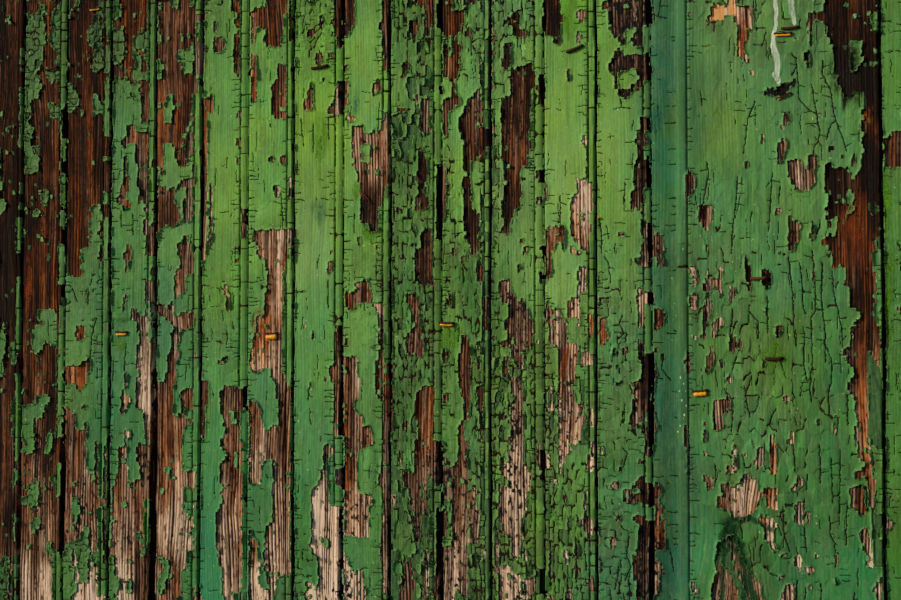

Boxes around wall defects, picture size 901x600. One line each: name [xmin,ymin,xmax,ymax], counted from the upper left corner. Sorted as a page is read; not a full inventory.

peeling [328,82,431,232]
peeling [406,0,548,358]
peeling [602,0,654,99]
crack [730,177,742,244]
crack [729,297,769,336]
crack [784,252,849,421]
crack [793,60,851,155]
peeling [777,0,901,516]
peeling [306,267,609,600]
peeling [705,435,786,558]
crack [782,498,807,552]
crack [819,446,853,567]